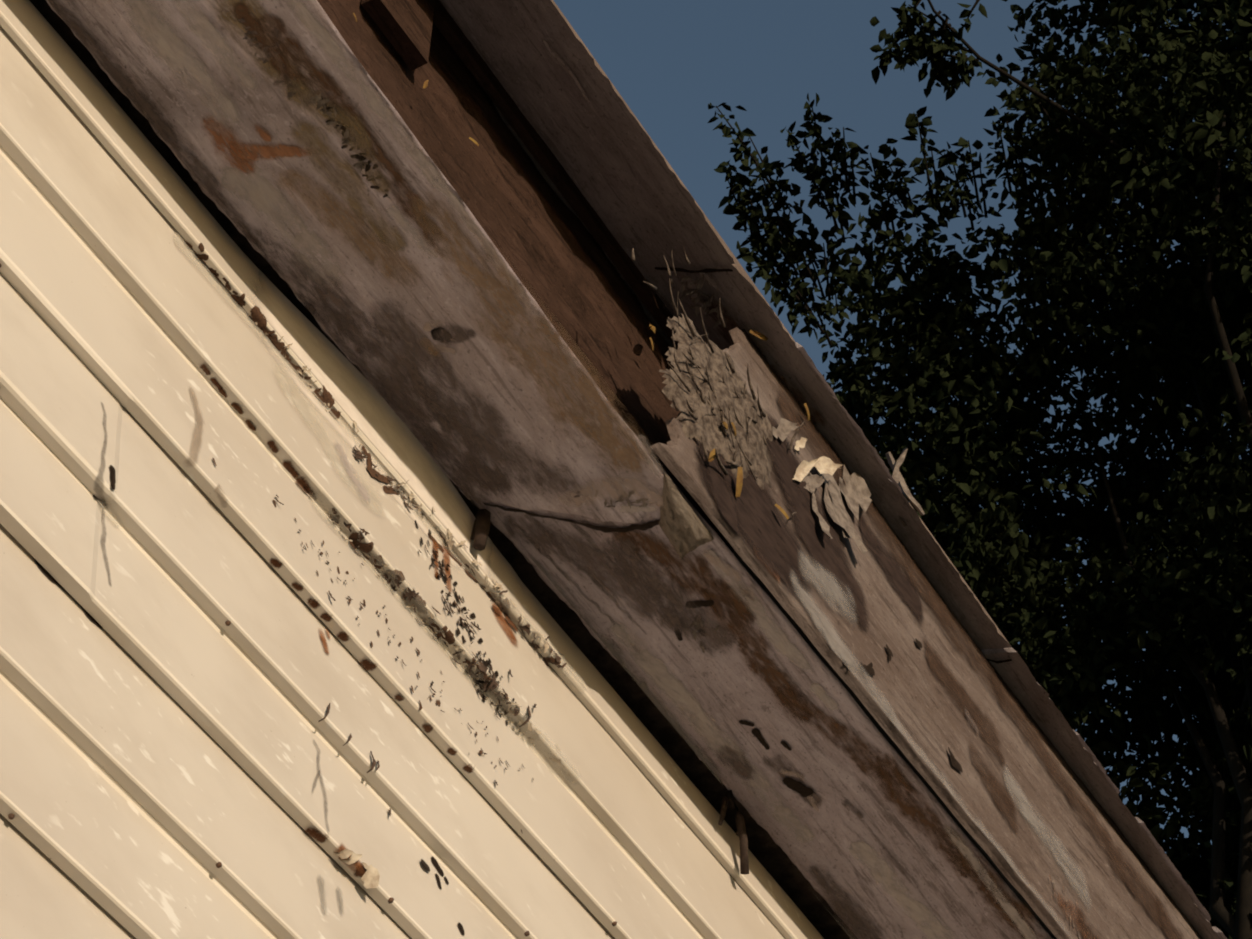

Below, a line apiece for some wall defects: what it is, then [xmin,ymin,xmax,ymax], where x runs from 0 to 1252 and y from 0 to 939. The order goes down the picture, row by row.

corrosion [203,118,311,174]
leakage [47,0,645,505]
peeling [185,241,341,419]
corrosion [292,583,349,654]
corrosion [360,660,377,671]
peeling [295,421,567,786]
corrosion [492,604,532,645]
crack [484,503,660,577]
leakage [504,517,1046,939]
peeling [772,418,872,554]
peeling [885,448,925,516]
leakage [859,498,1184,939]